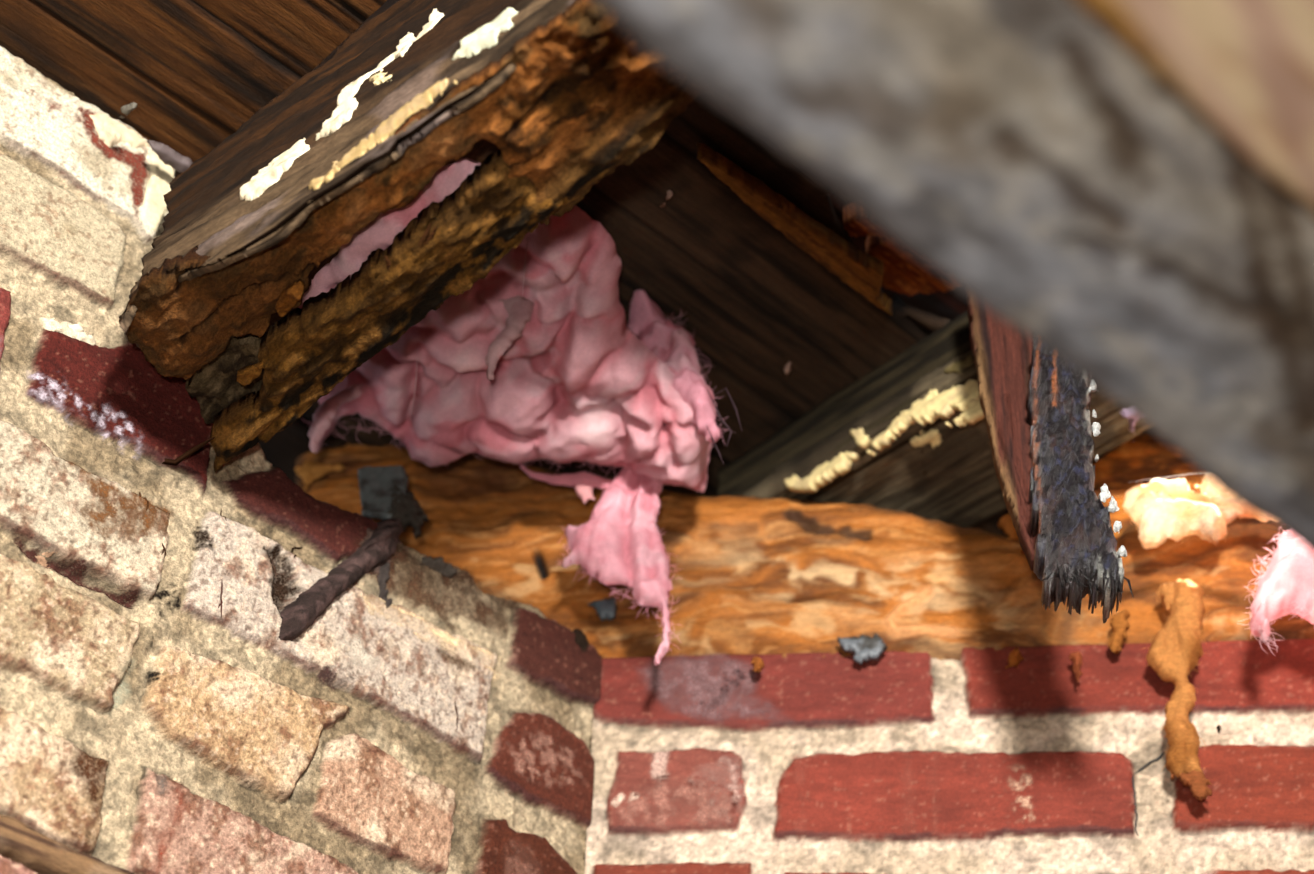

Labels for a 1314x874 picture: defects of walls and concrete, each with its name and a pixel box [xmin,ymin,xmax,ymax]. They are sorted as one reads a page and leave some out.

peeling [452,8,518,60]
peeling [239,8,458,201]
leakage [31,374,133,443]